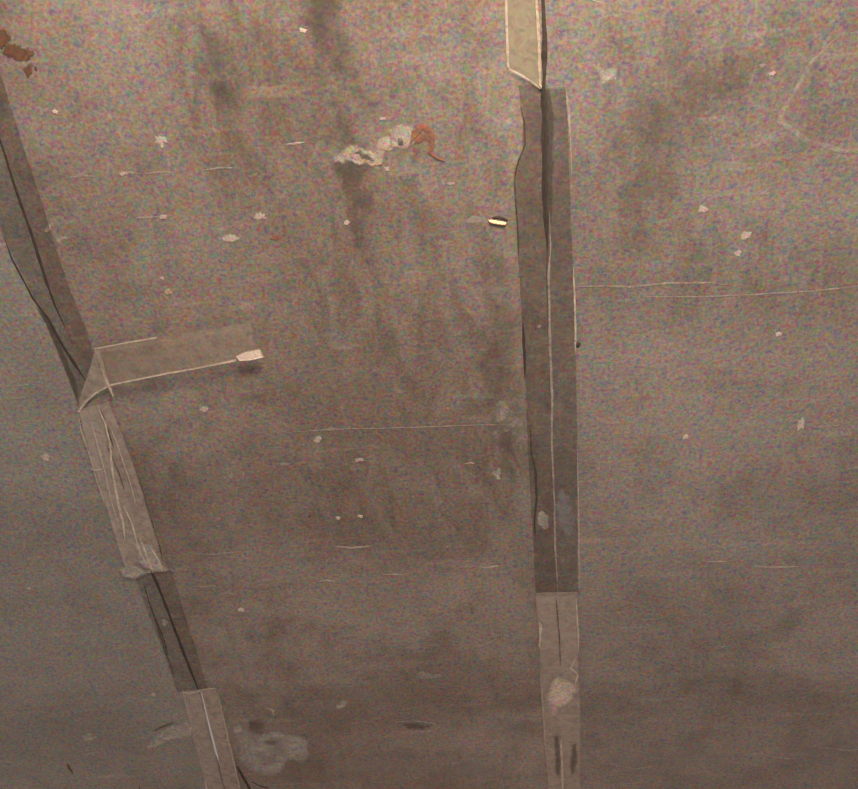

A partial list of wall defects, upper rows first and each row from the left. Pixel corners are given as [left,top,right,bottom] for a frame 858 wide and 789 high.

corrosion [0,29,37,78]
peeling [333,123,444,171]
crack [492,0,553,260]
crack [0,139,87,394]
crack [520,323,528,379]
crack [530,429,538,535]
crack [144,569,199,691]